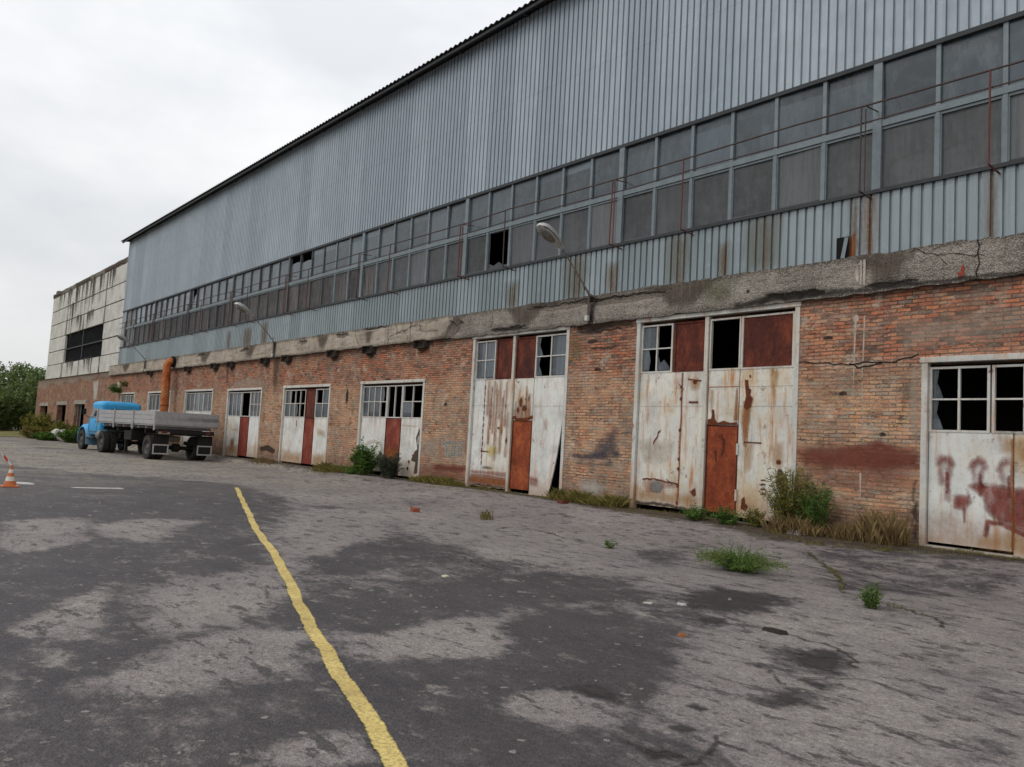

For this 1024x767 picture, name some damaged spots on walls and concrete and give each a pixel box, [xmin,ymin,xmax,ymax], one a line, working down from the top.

crack [917,239,985,277]
leakage [60,268,116,335]
crack [799,354,919,369]
rust [481,385,533,458]
rust [677,373,701,470]
rust [708,375,761,445]
rust [636,484,696,511]